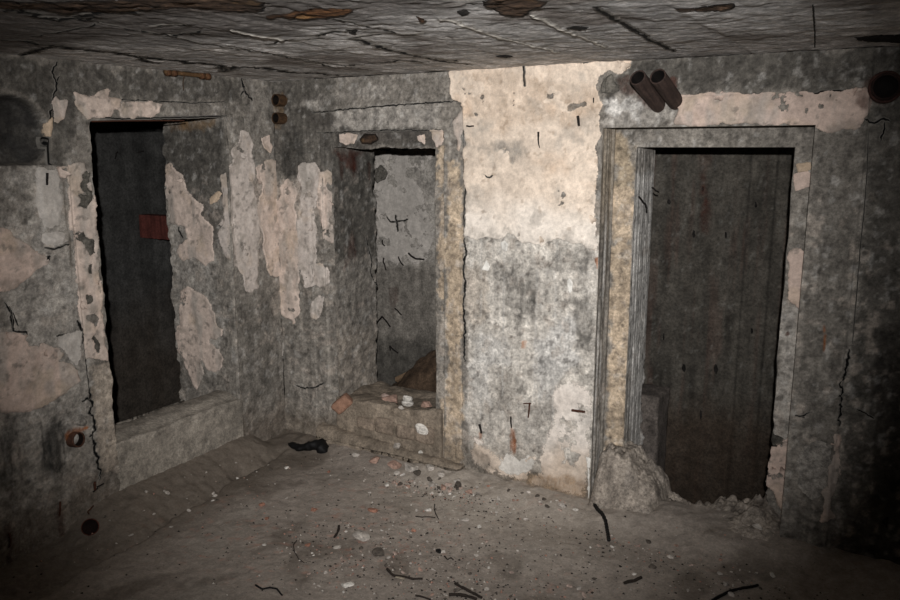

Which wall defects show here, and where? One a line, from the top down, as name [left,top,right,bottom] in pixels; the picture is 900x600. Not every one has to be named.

flaking render [42,89,162,137]
crack [0,6,608,204]
crack [592,6,677,52]
flaking render [674,87,872,133]
crack [810,4,818,48]
flaking render [0,162,108,414]
crack [56,296,102,480]
flaking render [175,286,224,389]
flaking render [165,130,334,324]
crack [461,188,469,362]
crack [836,117,890,427]